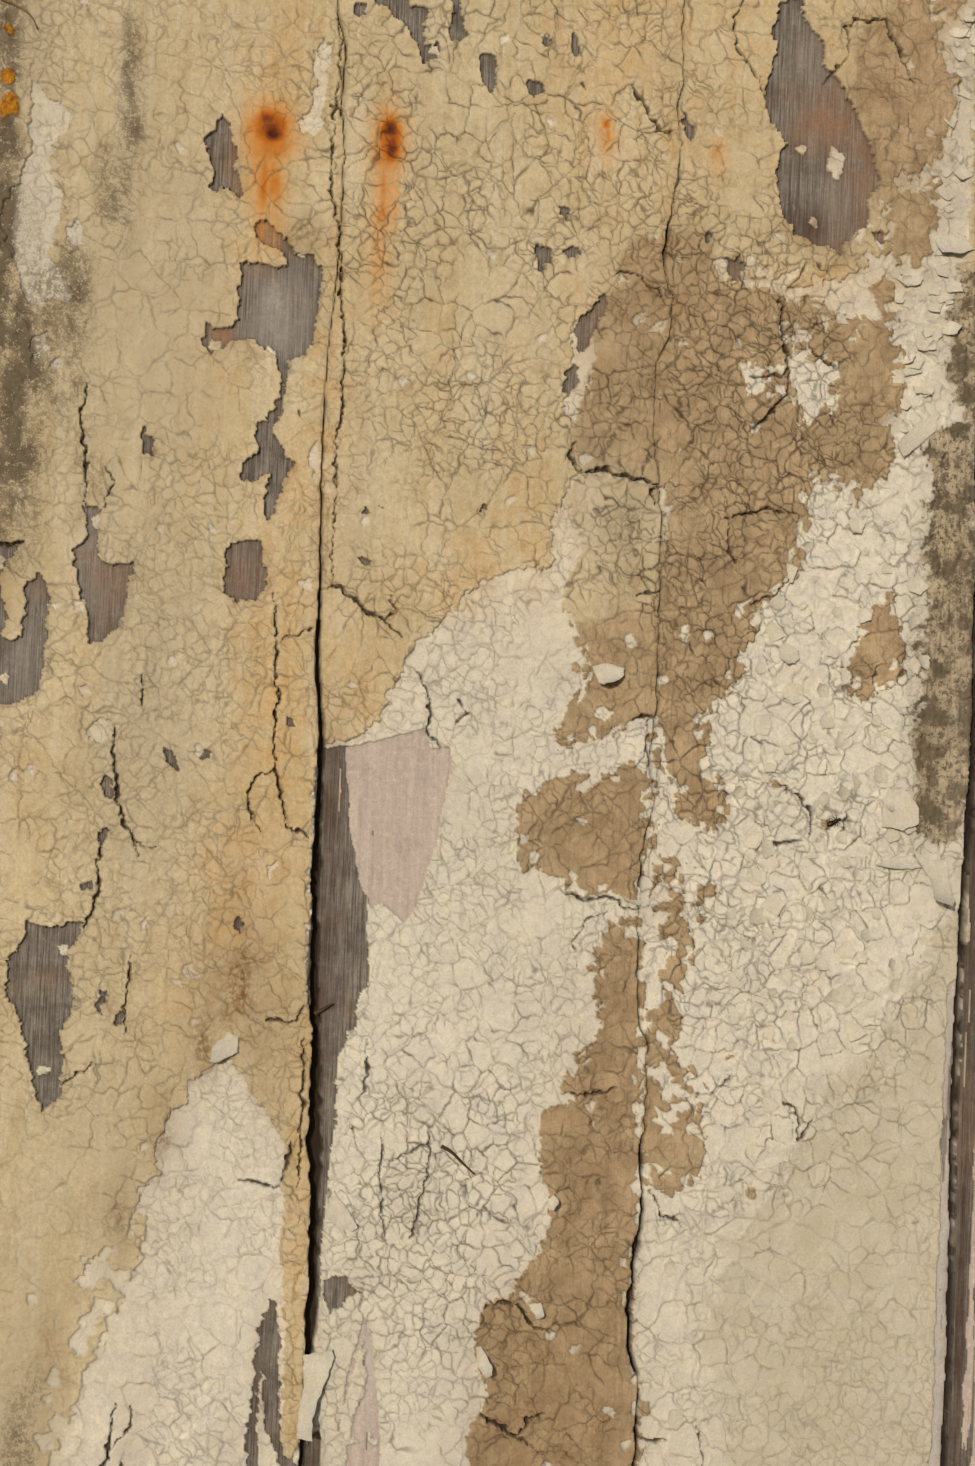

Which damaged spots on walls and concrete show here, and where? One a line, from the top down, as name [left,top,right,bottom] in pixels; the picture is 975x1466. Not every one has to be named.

rust [230,80,311,270]
rust [360,89,417,344]
peeling [202,219,325,521]
crack [330,253,400,624]
peeling [0,547,52,706]
crack [83,674,160,931]
crack [246,592,316,841]
crack [563,0,706,1466]
peeling [640,0,975,1466]
peeling [5,921,84,1113]
crack [238,1005,434,1243]
peeling [35,472,657,1466]